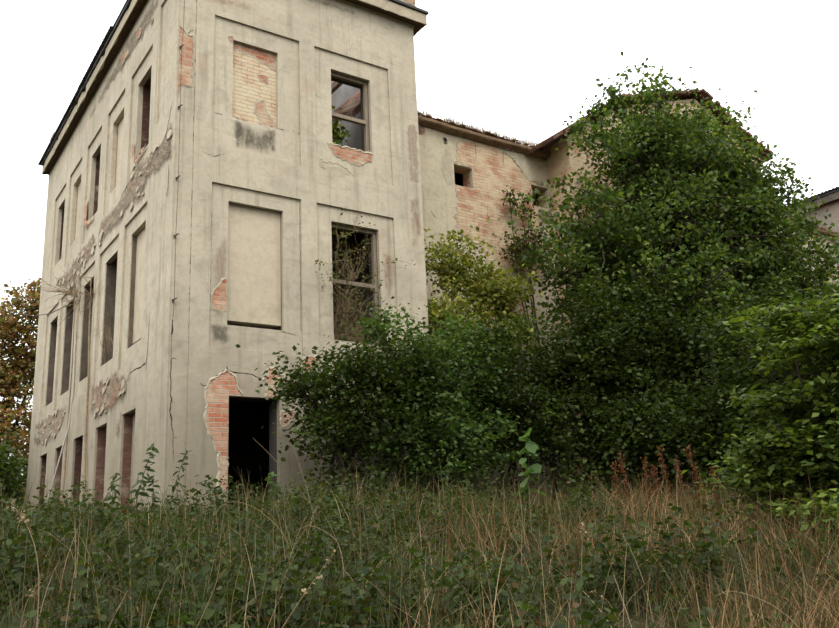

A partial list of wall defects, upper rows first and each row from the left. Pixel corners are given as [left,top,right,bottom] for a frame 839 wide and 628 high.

peeling [178,26,195,97]
peeling [228,35,276,85]
peeling [318,142,373,176]
spalling [56,125,173,286]
peeling [453,139,545,354]
peeling [210,251,227,314]
spalling [34,407,66,446]
spalling [91,372,127,418]
crack [169,293,190,458]
peeling [203,369,243,492]